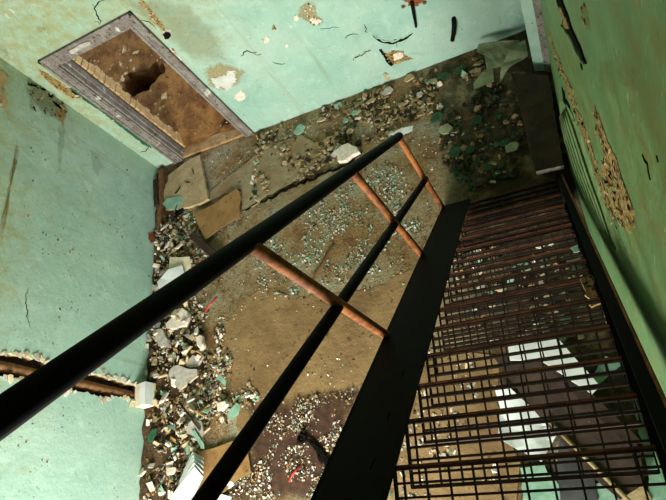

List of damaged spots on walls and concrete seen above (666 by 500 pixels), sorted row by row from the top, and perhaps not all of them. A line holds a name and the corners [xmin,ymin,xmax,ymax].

crack [324,24,413,61]
flaking render [379,49,413,66]
peeling [211,70,246,102]
peeling [27,69,152,148]
peeling [548,30,636,234]
flaking render [0,350,50,369]
flaking render [0,373,25,384]
flaking render [63,365,137,408]